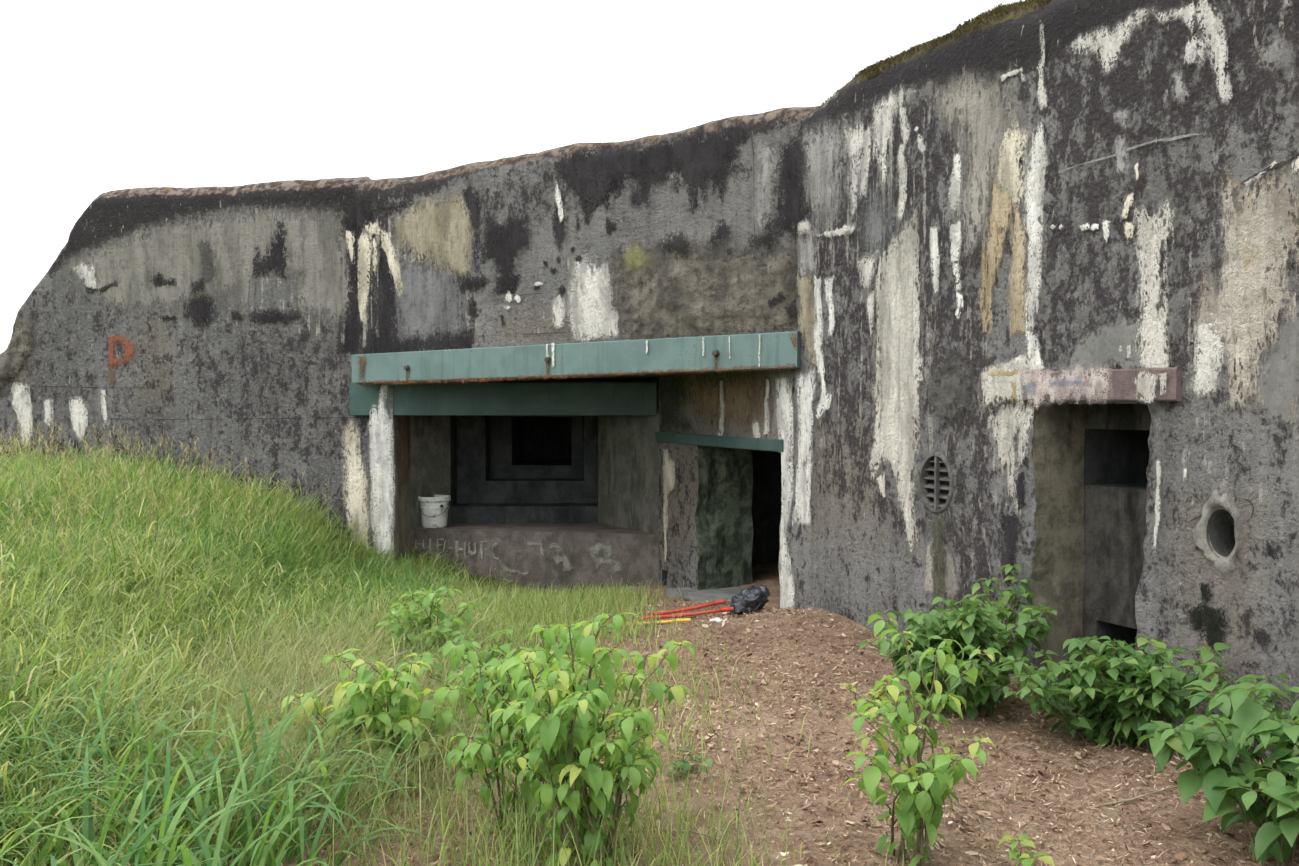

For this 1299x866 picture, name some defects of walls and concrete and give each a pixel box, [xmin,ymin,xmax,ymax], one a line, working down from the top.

damp [149,241,307,330]
damp [252,220,289,279]
damp [341,184,540,354]
damp [543,123,747,297]
damp [747,129,811,252]
damp [766,292,796,319]
crack [1059,133,1205,172]
rust [358,334,796,424]